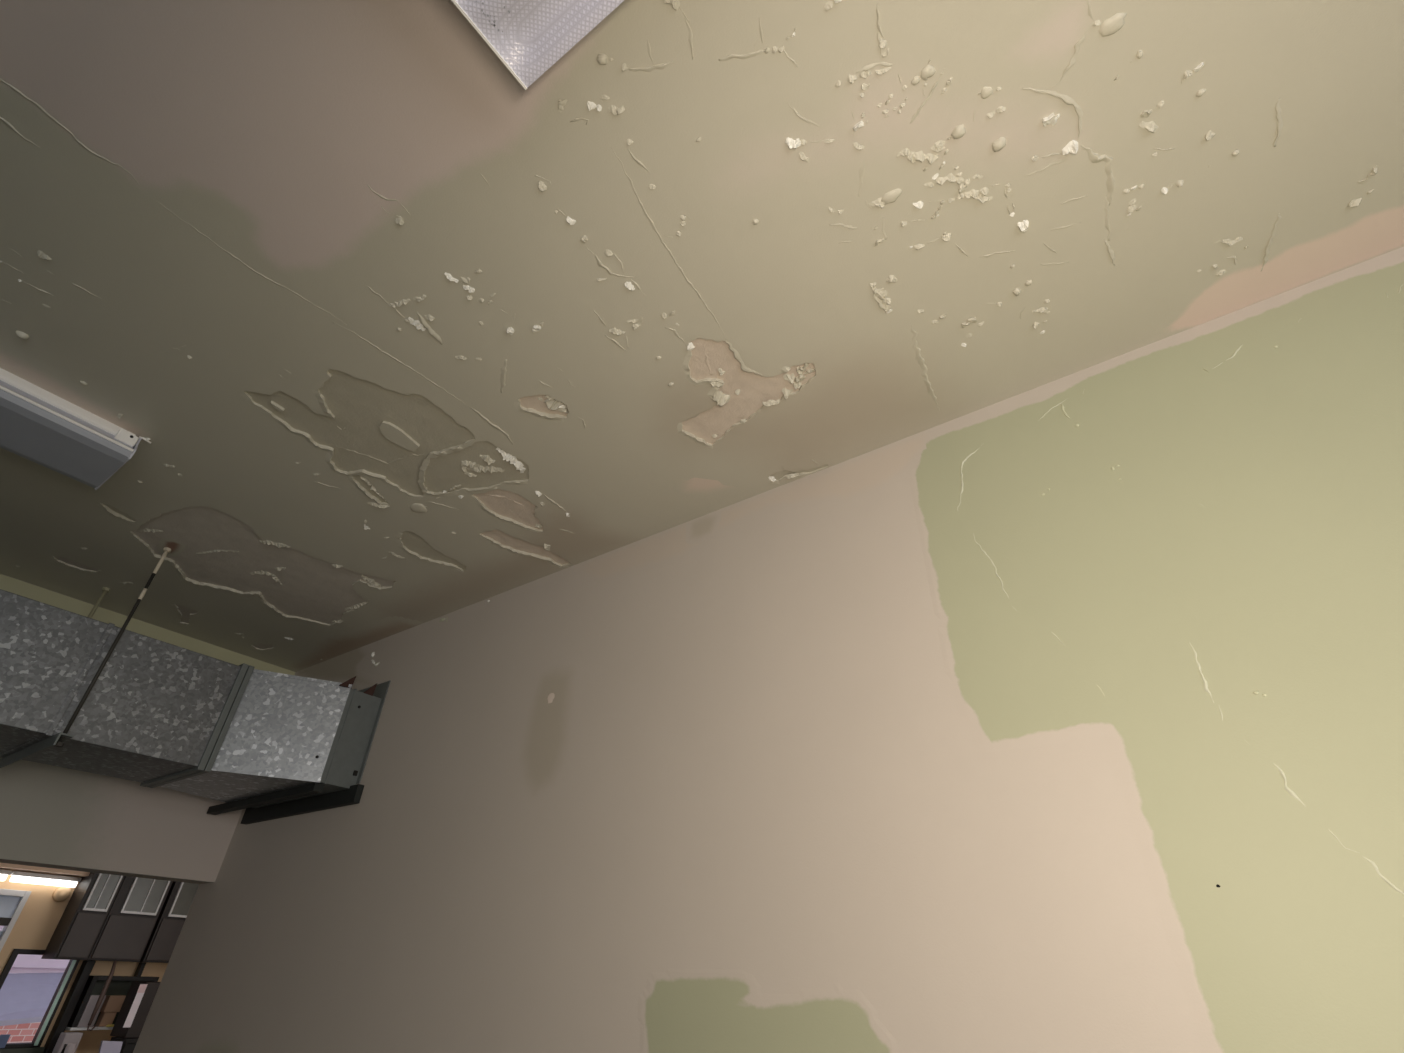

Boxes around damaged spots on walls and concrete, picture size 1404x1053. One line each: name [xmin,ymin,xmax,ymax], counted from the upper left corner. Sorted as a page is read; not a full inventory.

crack [0,79,513,445]
peeling [444,269,515,335]
crack [611,139,762,376]
peeling [662,311,816,449]
peeling [785,137,835,163]
peeling [866,148,1029,249]
crack [956,0,1115,266]
peeling [240,369,573,573]
peeling [97,503,395,627]
damp [511,654,584,810]
crack [1189,642,1306,807]
crack [1329,830,1404,895]